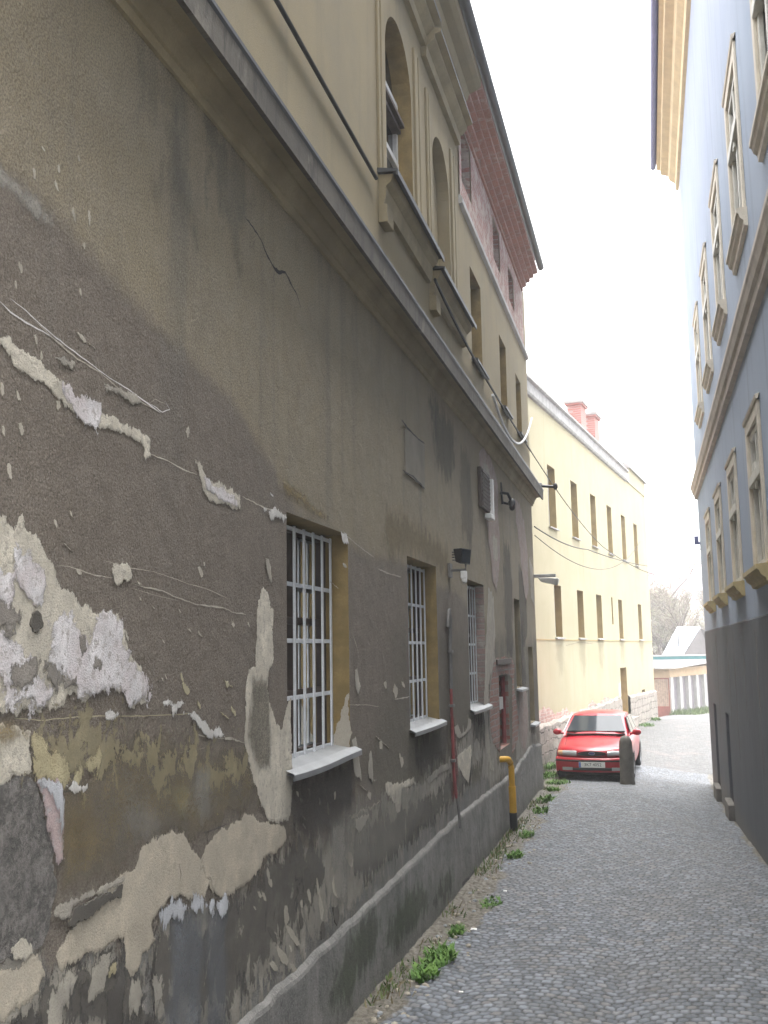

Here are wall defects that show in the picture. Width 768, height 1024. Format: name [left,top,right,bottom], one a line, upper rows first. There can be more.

crack [243,198,299,300]
peeling [34,334,75,370]
spalling [56,381,102,436]
peeling [104,383,142,405]
spalling [0,447,621,1024]